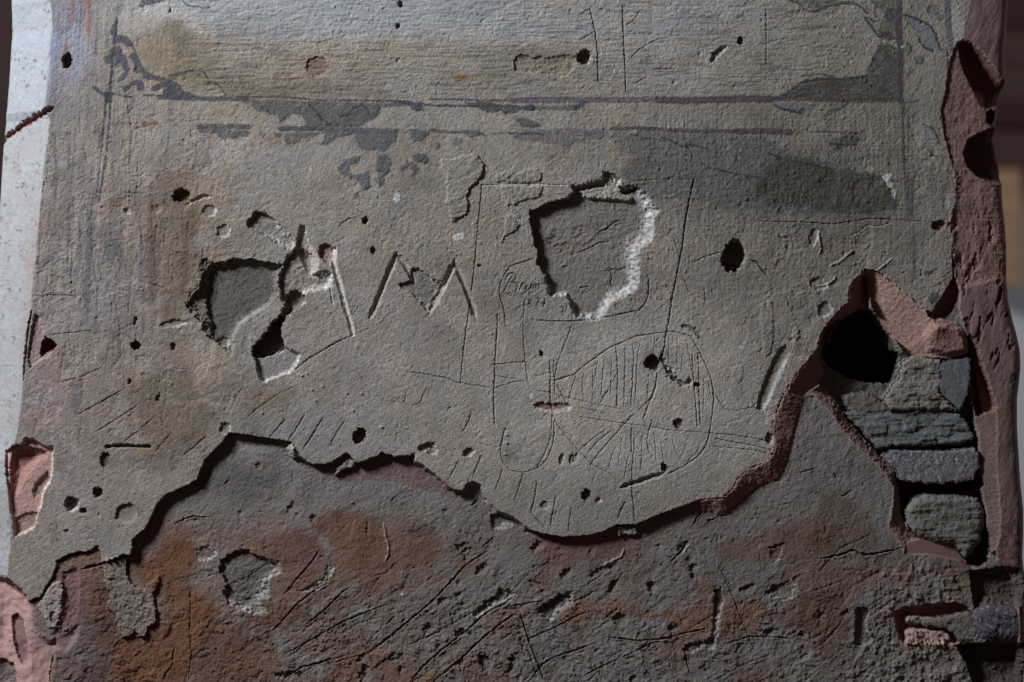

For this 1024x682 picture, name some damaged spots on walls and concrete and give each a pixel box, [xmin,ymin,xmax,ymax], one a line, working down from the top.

spalling [941,39,1006,290]
spalling [529,171,662,322]
spalling [198,257,284,353]
peeling [252,315,301,383]
hole [824,310,899,384]
spalling [5,437,54,537]
peeling [99,452,111,468]
peeling [114,503,137,524]
spalling [413,453,513,531]
spalling [223,548,283,616]
spalling [538,590,575,624]
spalling [691,597,725,654]